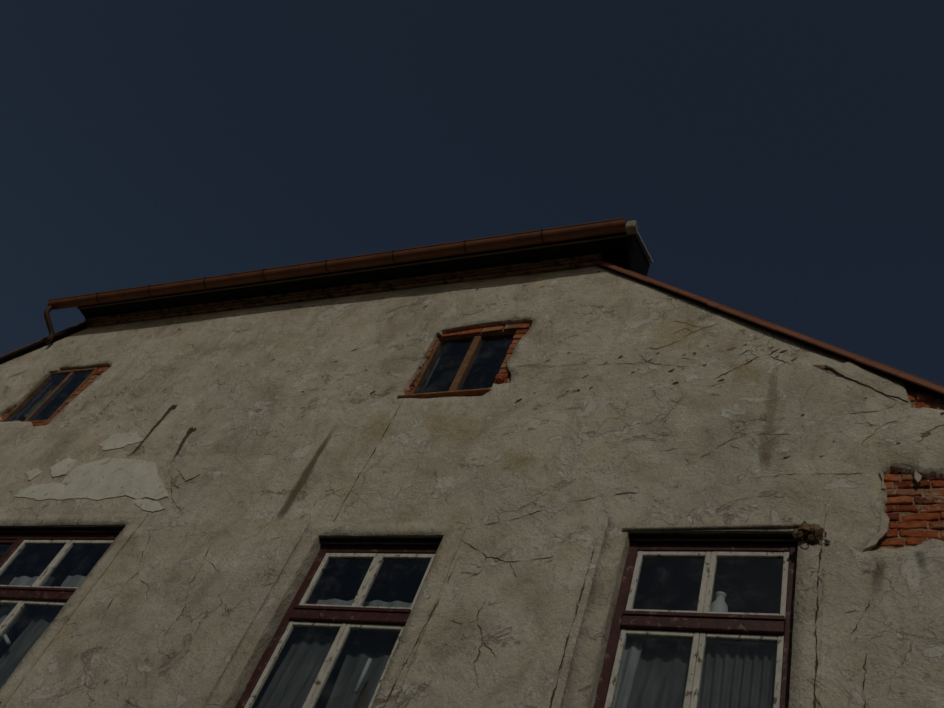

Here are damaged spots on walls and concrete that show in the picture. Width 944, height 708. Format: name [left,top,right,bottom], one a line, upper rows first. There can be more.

flaking render [0,363,111,427]
flaking render [397,319,533,399]
crack [817,367,899,443]
flaking render [813,361,944,415]
flaking render [14,431,169,513]
flaking render [862,465,944,552]
crack [383,492,647,708]
crack [813,524,826,708]